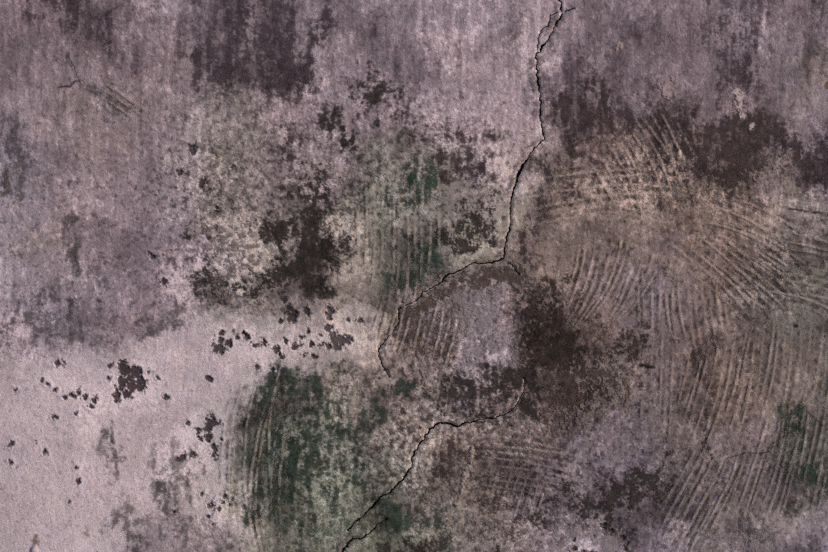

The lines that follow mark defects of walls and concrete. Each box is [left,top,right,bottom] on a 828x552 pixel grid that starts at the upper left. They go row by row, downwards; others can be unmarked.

leakage [315,62,504,259]
crack [376,0,574,377]
leakage [389,18,828,431]
crack [338,379,526,552]